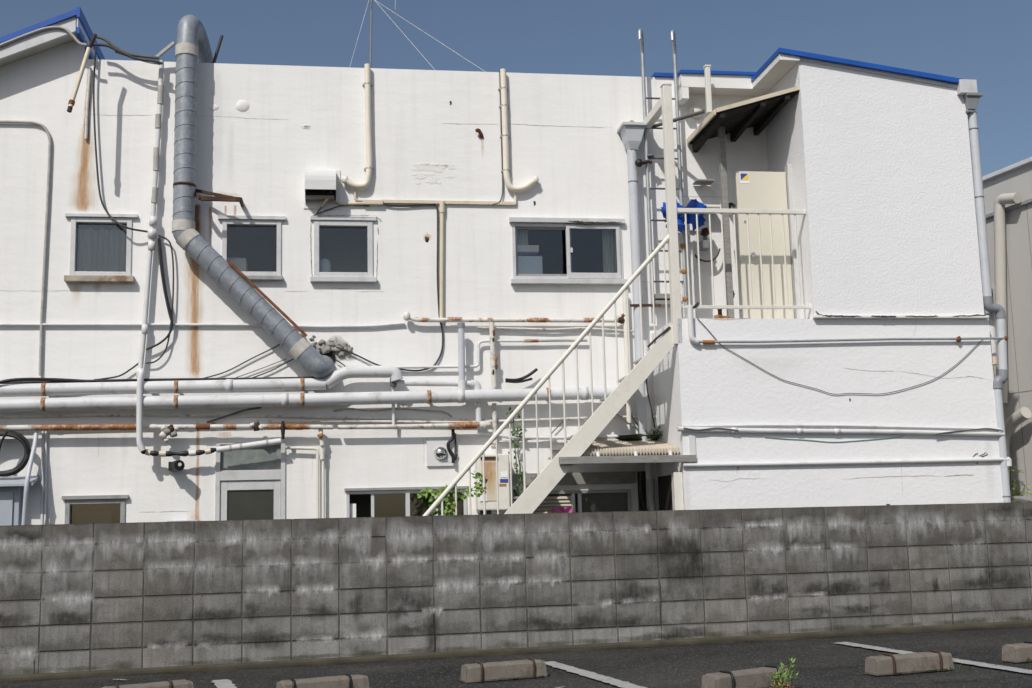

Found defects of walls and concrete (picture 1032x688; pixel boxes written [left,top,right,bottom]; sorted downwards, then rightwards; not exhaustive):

corrosion [80,67,92,205]
water stain [741,522,810,533]
water stain [365,528,522,568]